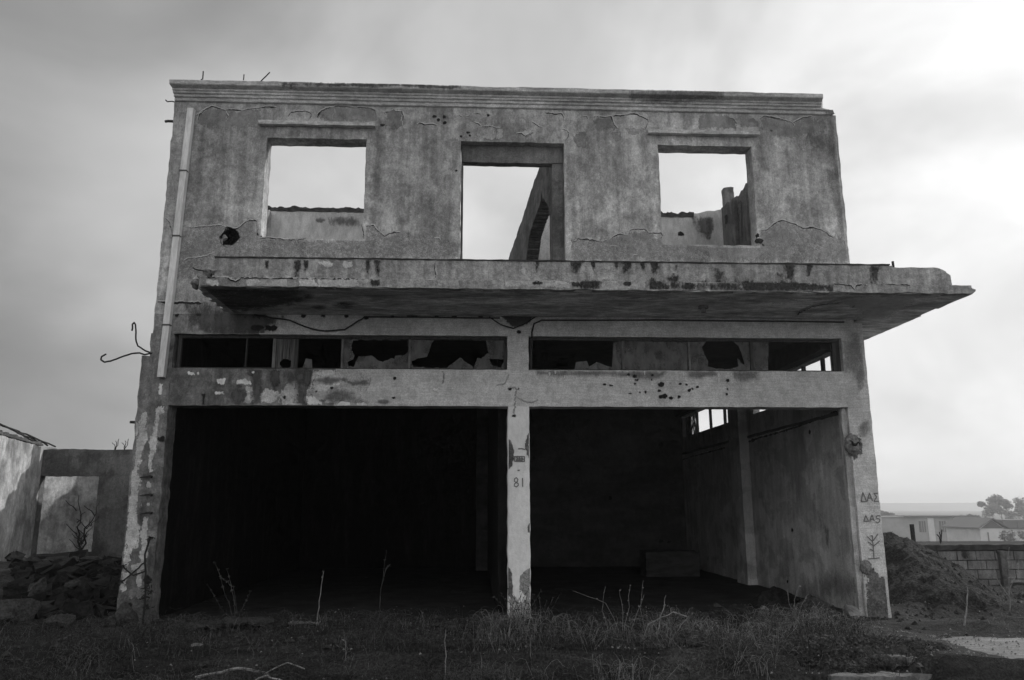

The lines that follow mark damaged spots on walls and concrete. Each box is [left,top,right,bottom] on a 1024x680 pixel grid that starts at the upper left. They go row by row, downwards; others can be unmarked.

peeling [320,106,404,130]
peeling [573,116,644,148]
crack [761,219,836,239]
peeling [180,222,459,287]
leakage [366,260,380,286]
leakage [570,262,601,289]
peeling [201,370,395,406]
peeling [120,383,165,591]
spalling [508,567,530,619]
peeling [864,567,889,618]